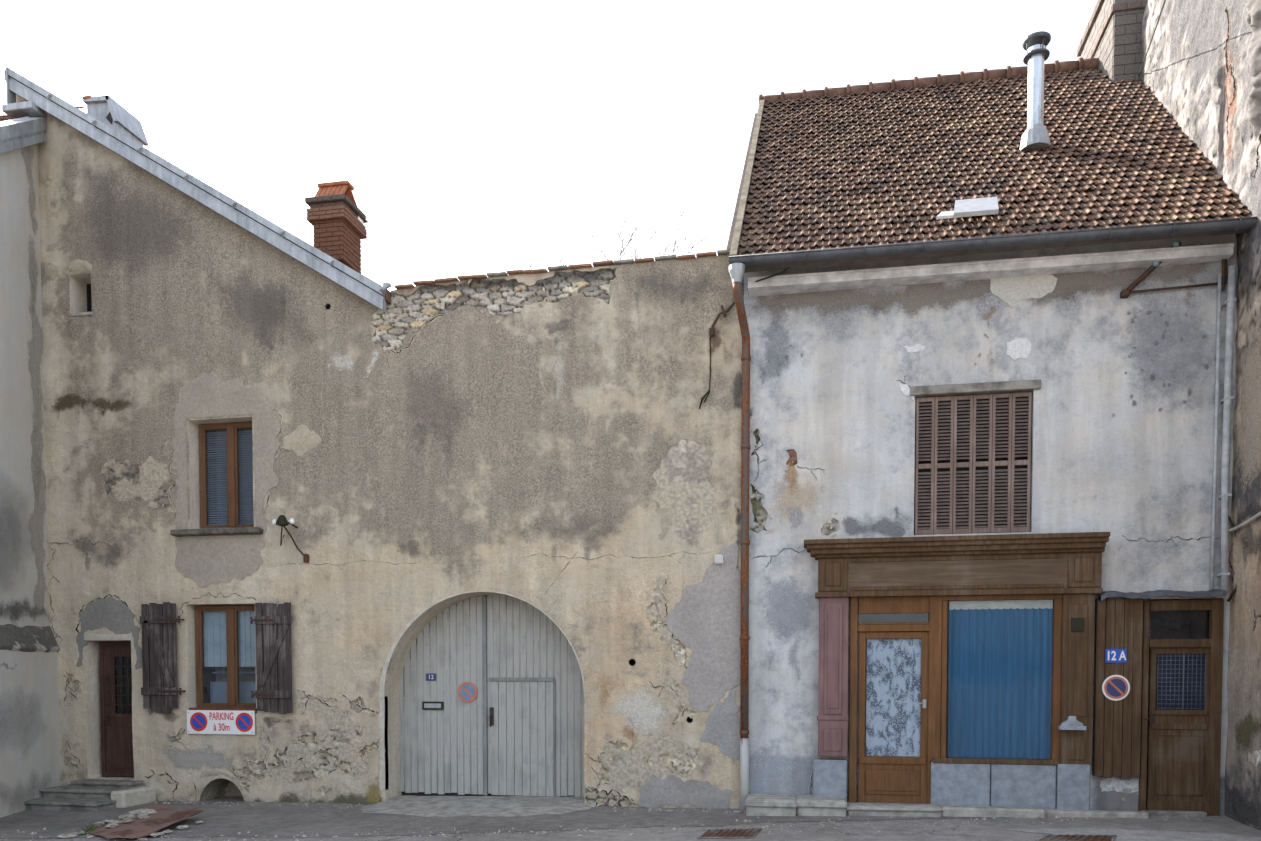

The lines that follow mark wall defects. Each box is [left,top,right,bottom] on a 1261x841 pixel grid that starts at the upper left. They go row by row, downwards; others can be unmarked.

crack [1253,134,1261,178]
flaking render [372,269,616,352]
flaking render [101,456,175,513]
peeling [785,449,797,471]
rust [786,463,797,494]
peeling [749,484,772,533]
crack [267,560,420,571]
flaking render [231,692,386,801]
flaking render [1248,750,1261,766]